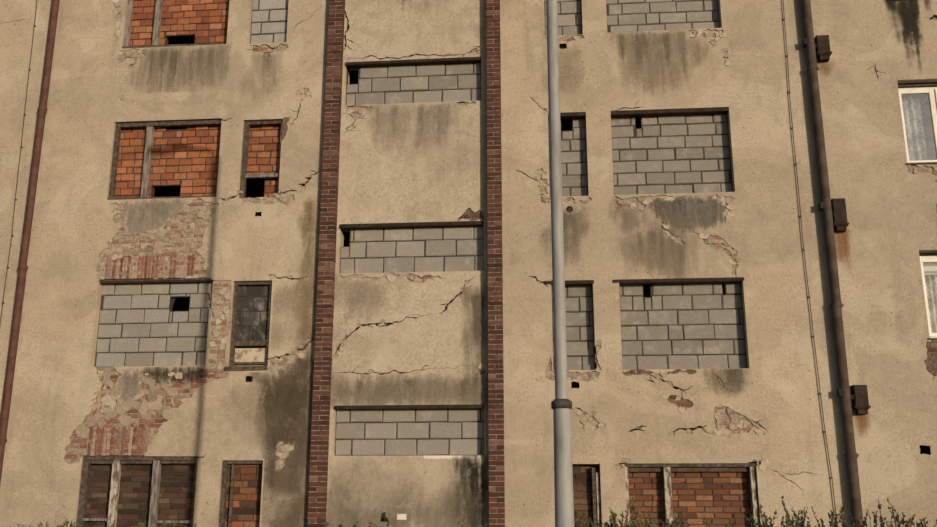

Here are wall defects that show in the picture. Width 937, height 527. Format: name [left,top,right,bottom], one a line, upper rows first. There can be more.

damp [887,0,929,66]
flaking render [113,49,147,70]
flaking render [712,194,736,220]
flaking render [698,233,742,275]
flaking render [64,199,232,465]
crack [267,334,315,364]
crack [332,280,474,379]
flaking render [924,340,937,381]
damp [255,358,313,527]
flaking render [661,392,695,413]
flaking render [713,406,765,438]
damp [328,455,487,527]